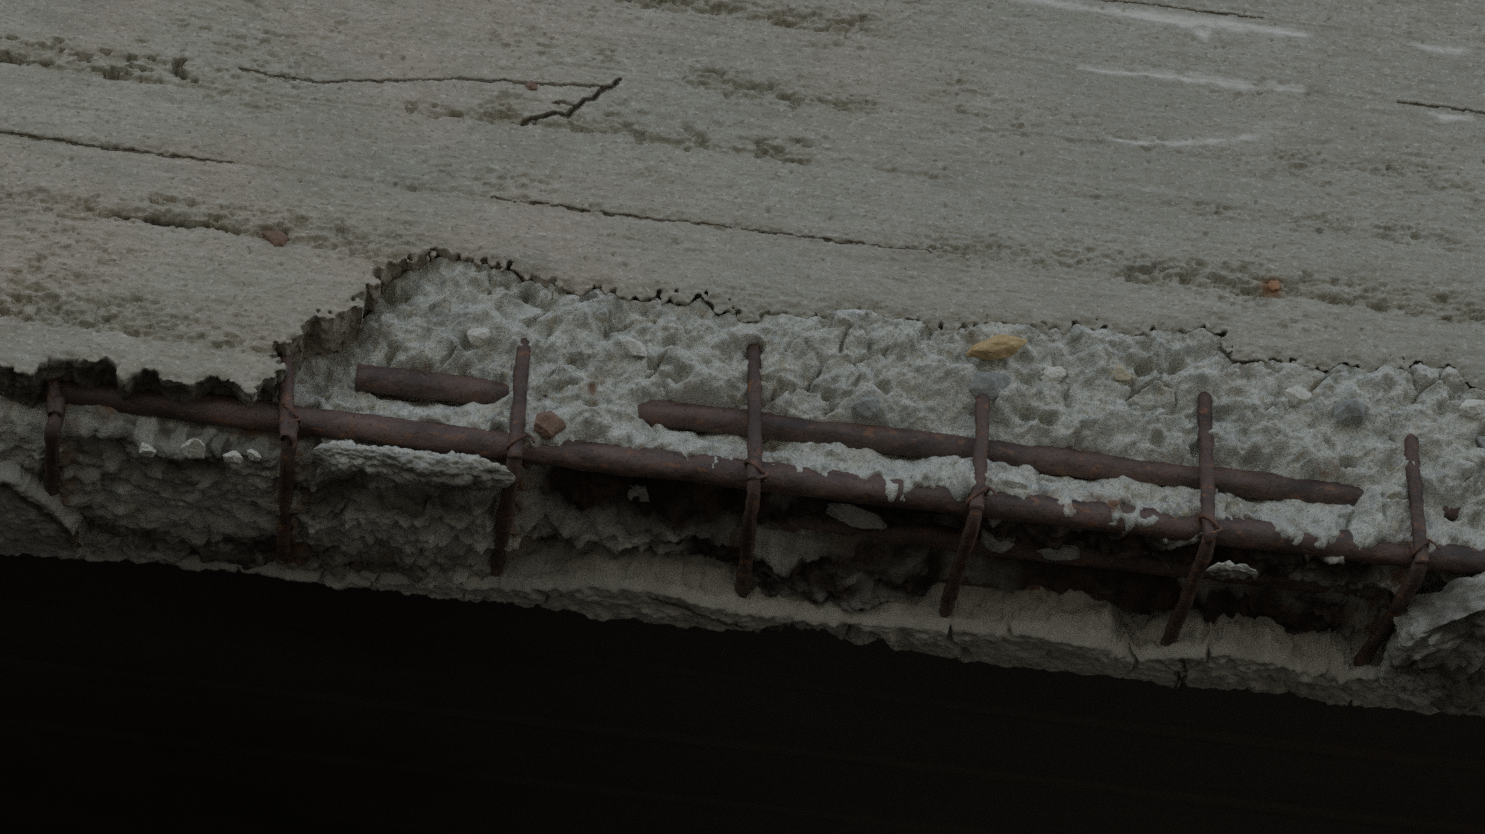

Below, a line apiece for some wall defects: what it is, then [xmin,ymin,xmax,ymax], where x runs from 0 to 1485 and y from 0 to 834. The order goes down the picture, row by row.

crack [239,67,622,126]
spalling [0,257,1485,645]